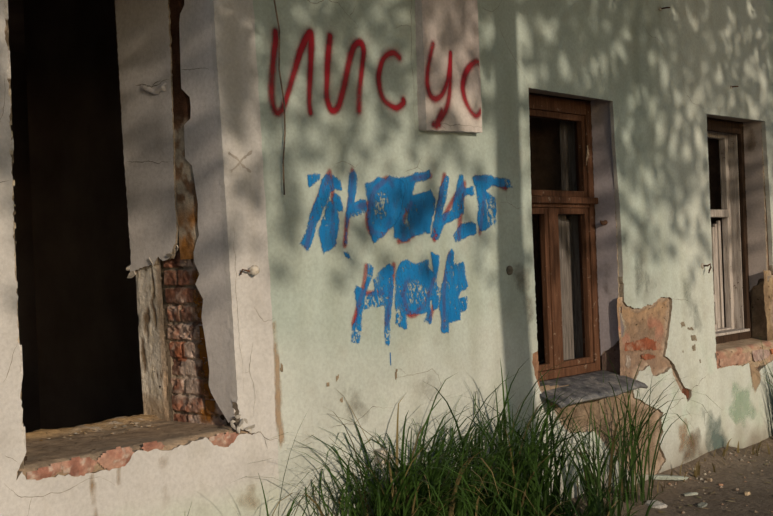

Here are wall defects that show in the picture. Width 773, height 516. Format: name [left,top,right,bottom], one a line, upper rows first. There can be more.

spalling [4,0,23,376]
flaking render [164,245,255,447]
flaking render [602,297,692,399]
flaking render [720,270,773,367]
spalling [21,421,164,480]